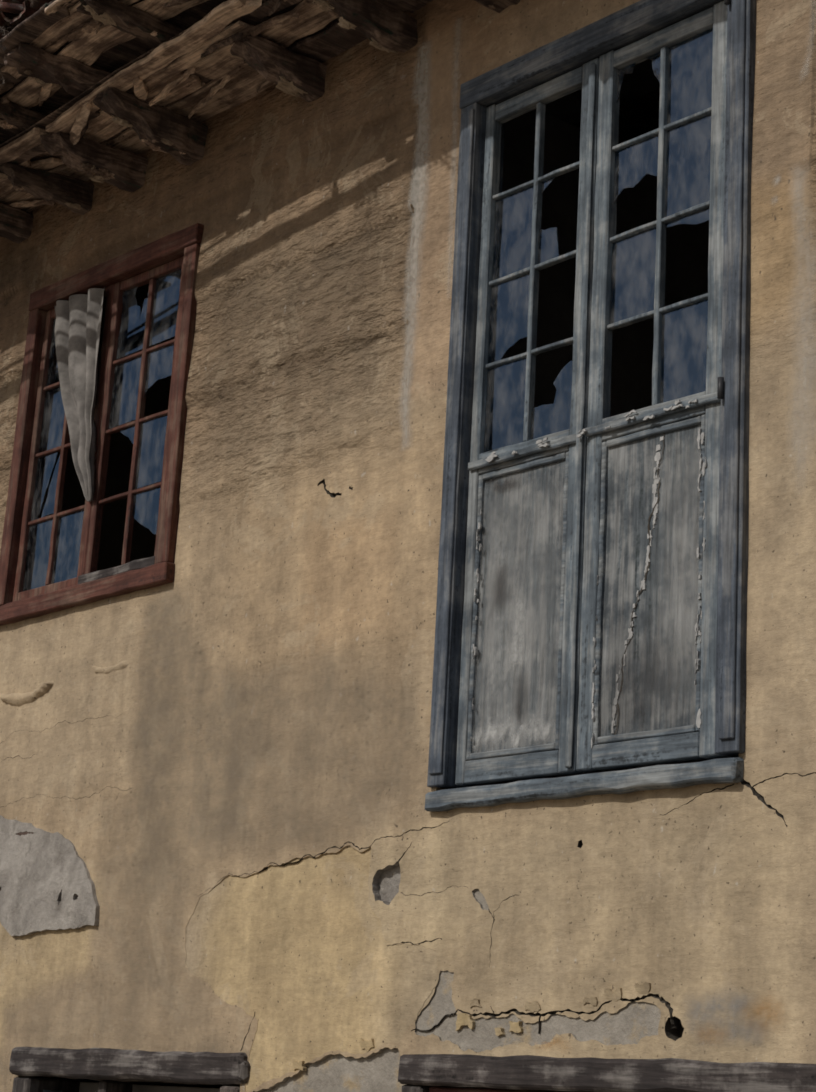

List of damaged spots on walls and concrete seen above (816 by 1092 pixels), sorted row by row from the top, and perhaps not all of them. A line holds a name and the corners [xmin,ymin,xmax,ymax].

crack [660,772,816,827]
flaking render [0,815,100,937]
crack [198,821,449,896]
flaking render [185,845,684,1092]
crack [411,982,678,1034]